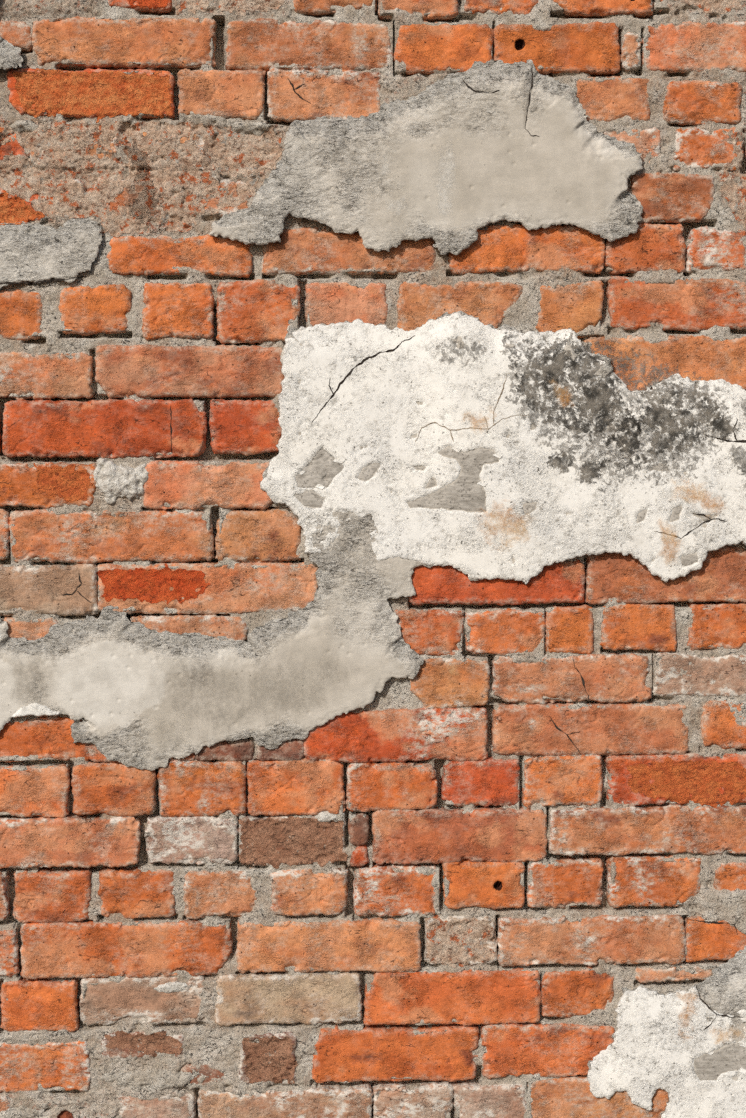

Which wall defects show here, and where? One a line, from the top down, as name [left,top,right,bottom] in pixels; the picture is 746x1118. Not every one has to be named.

spalling [128,0,284,16]
crack [525,68,540,137]
peeling [0,37,643,289]
crack [312,335,415,422]
water stain [500,332,746,496]
peeling [0,311,746,771]
spalling [626,756,746,808]
spalling [237,816,348,870]
peeling [587,946,746,1118]